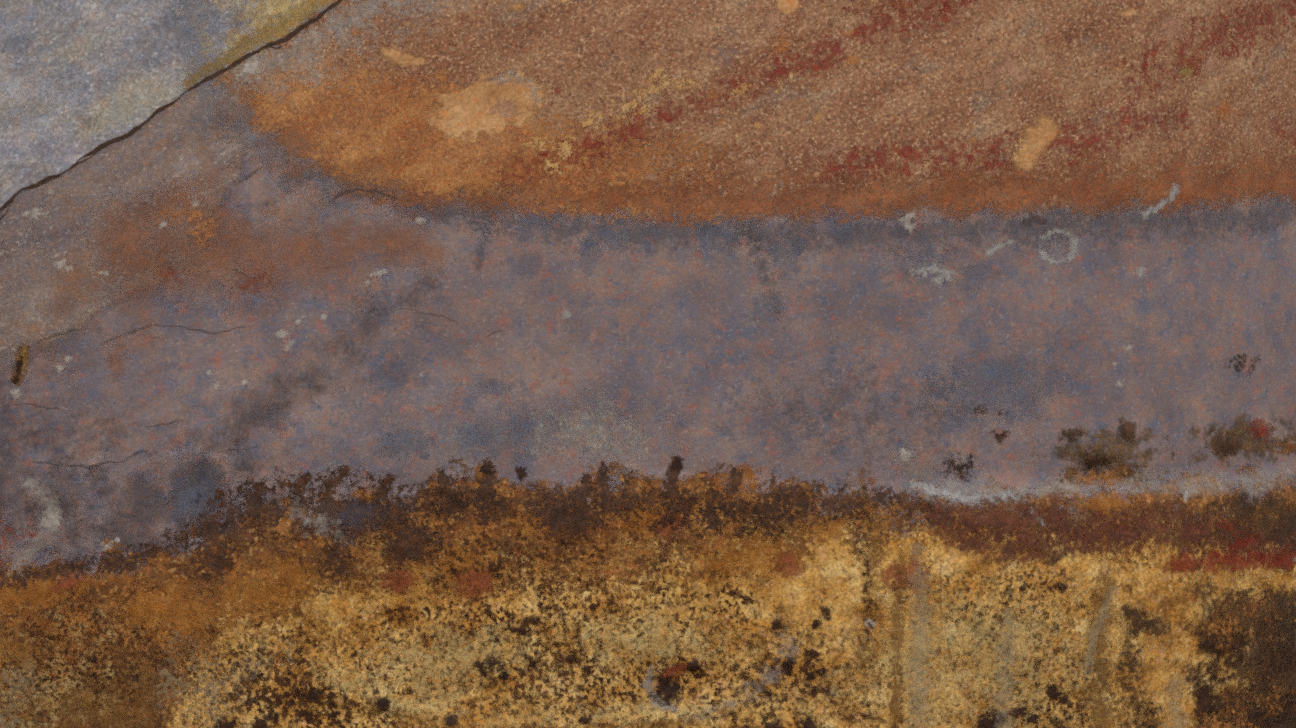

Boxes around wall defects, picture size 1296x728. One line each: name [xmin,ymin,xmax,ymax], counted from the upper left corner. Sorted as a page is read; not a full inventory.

crack [0,0,342,219]
corrosion [0,456,1296,728]